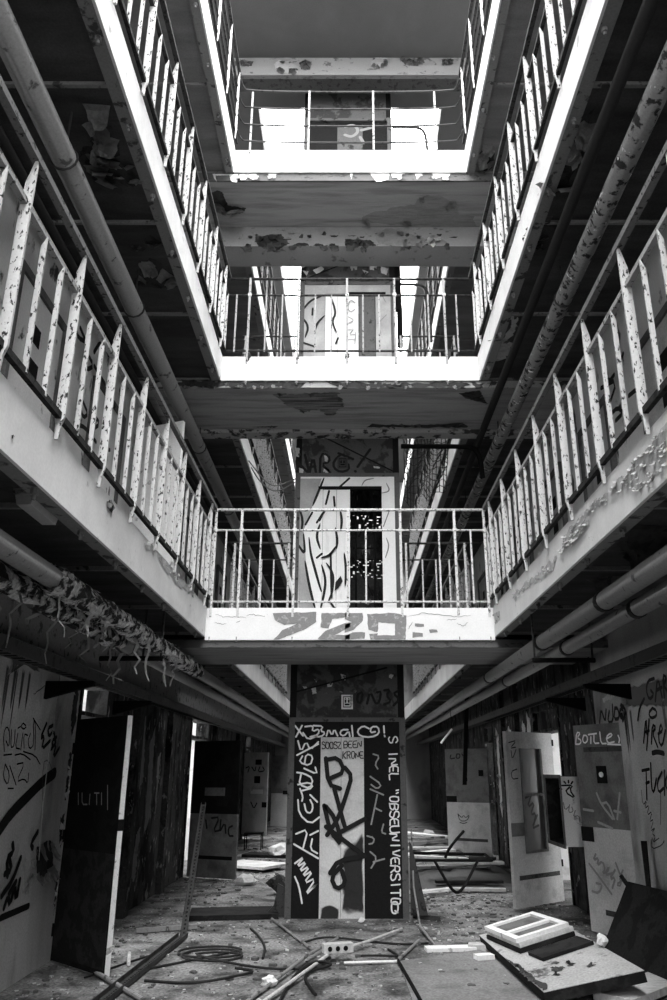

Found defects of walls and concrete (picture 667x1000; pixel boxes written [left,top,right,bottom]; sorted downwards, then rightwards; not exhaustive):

peeling [371,57,388,69]
peeling [400,56,425,66]
peeling [80,104,144,189]
peeling [535,109,596,196]
peeling [208,173,276,218]
peeling [240,228,457,253]
peeling [534,216,559,252]
peeling [489,316,519,363]
peeling [181,378,489,416]
peeling [512,422,667,602]